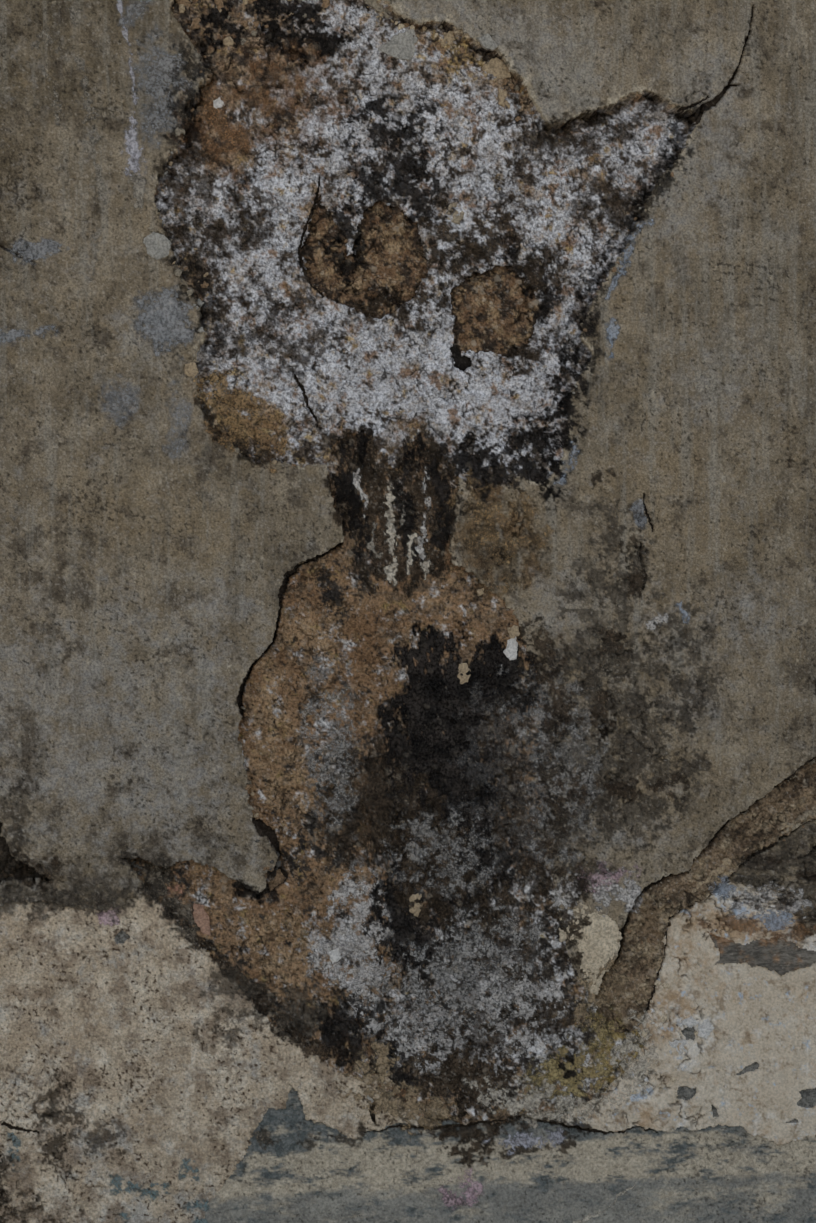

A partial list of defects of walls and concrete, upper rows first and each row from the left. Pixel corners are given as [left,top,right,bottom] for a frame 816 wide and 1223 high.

crack [677,8,753,125]
spalling [143,0,696,555]
crack [236,542,343,716]
crack [252,818,288,894]
damp [0,469,722,1175]
spalling [0,508,816,1223]
damp [0,1156,61,1223]
crack [369,1104,658,1135]